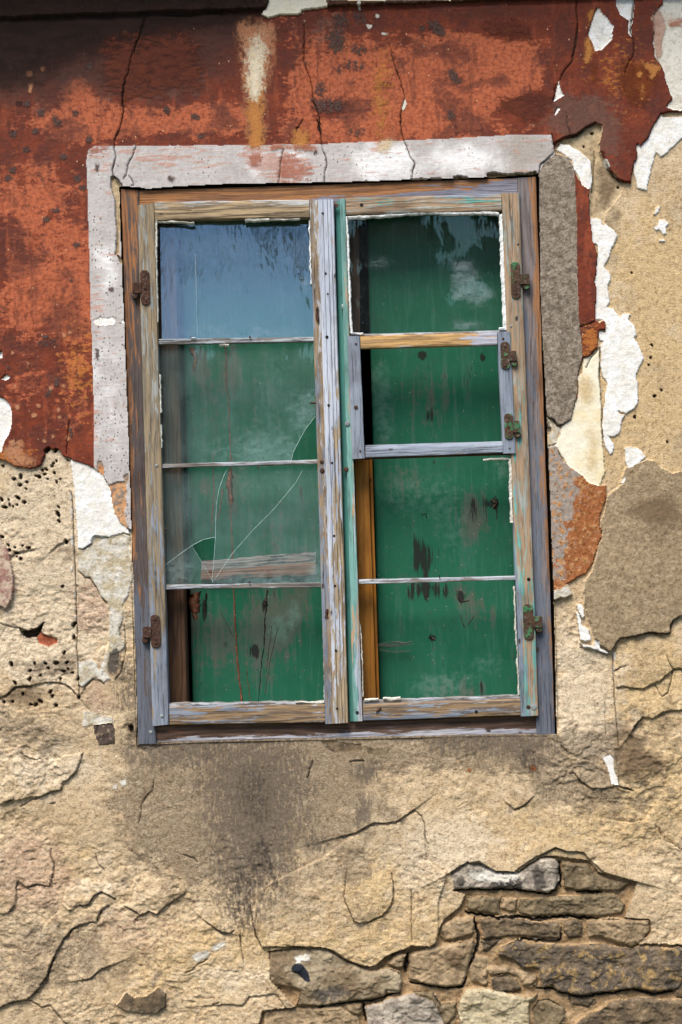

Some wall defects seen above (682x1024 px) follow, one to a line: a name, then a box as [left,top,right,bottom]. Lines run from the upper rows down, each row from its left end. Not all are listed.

water stain [236,16,276,149]
corrosion [248,129,316,183]
corrosion [583,9,597,82]
corrosion [620,60,661,105]
peeling [634,0,682,191]
peeling [547,124,653,655]
peeling [0,397,133,745]
crack [590,617,680,746]
water stain [127,739,328,930]
crack [1,857,184,1024]
crack [207,848,602,1020]
flaking render [259,856,682,1024]